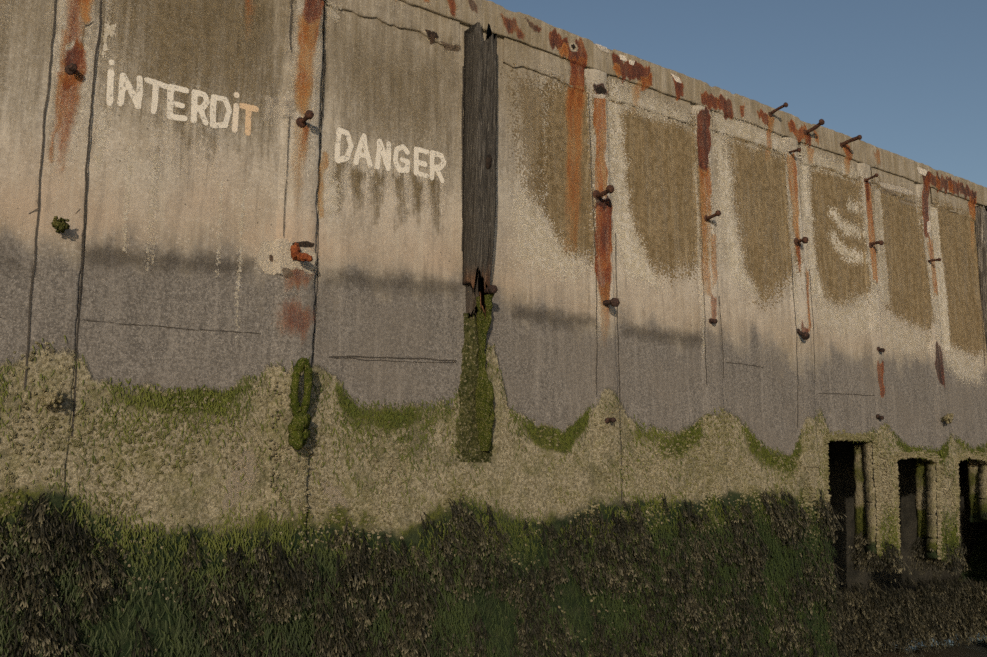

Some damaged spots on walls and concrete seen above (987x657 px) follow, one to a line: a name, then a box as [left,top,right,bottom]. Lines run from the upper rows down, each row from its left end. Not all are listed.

rust [59,0,92,143]
rust [296,0,324,113]
rust [502,15,613,301]
rust [612,52,652,90]
rust [697,91,744,278]
damp [500,62,987,387]
rust [757,109,774,143]
rust [787,153,811,333]
rust [788,119,819,160]
rust [922,170,977,294]